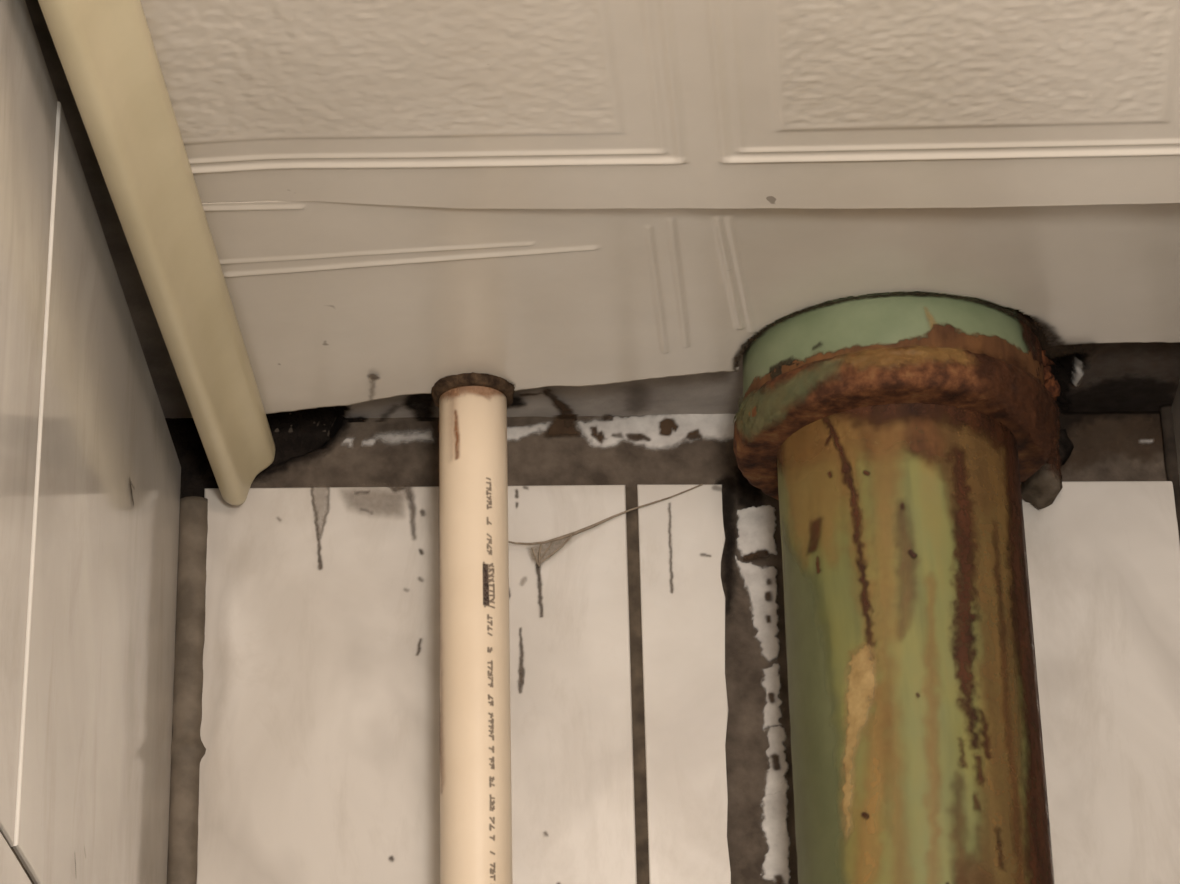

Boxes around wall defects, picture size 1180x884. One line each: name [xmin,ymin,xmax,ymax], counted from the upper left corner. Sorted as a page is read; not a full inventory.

corrosion [743,310,1061,401]
damp [403,394,434,421]
damp [507,389,702,443]
damp [165,418,219,499]
damp [311,486,329,569]
damp [388,483,424,534]
damp [717,468,769,611]
corrosion [776,403,1054,884]
damp [771,754,780,770]